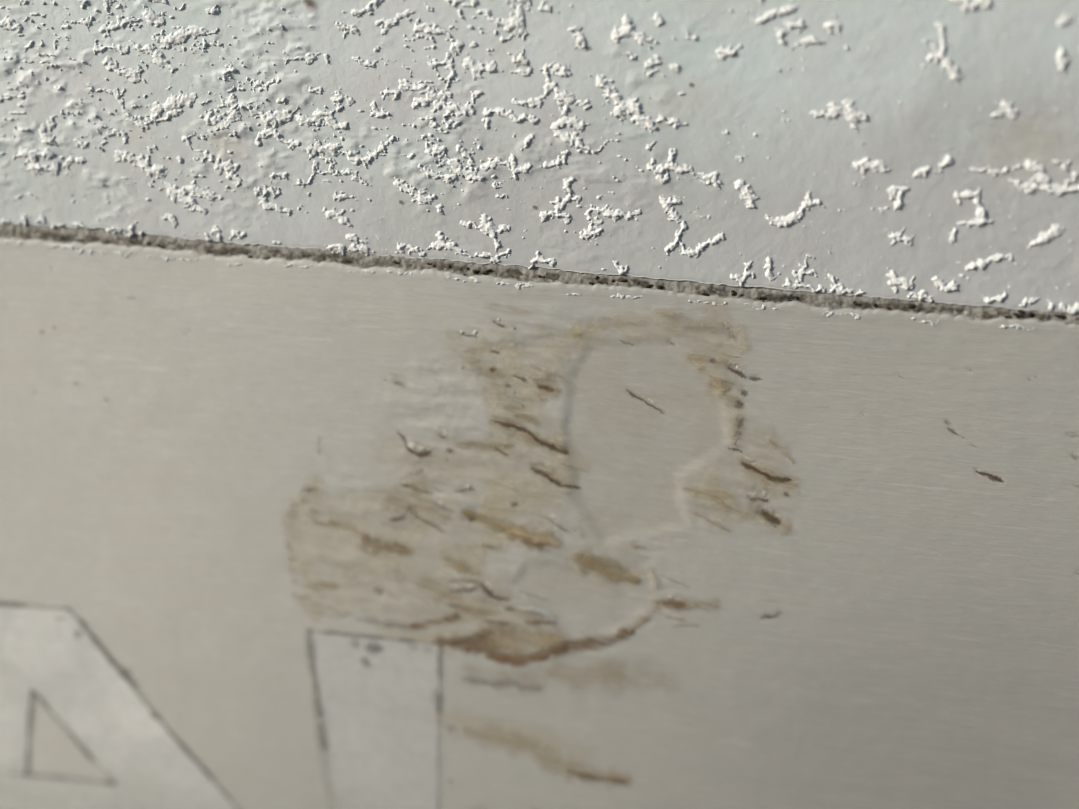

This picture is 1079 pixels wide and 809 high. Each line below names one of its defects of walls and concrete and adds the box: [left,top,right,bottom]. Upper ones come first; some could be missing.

crack [626,390,663,414]
crack [388,427,473,521]
crack [495,421,580,489]
crack [731,416,791,527]
leakage [445,480,559,575]
crack [450,572,553,625]